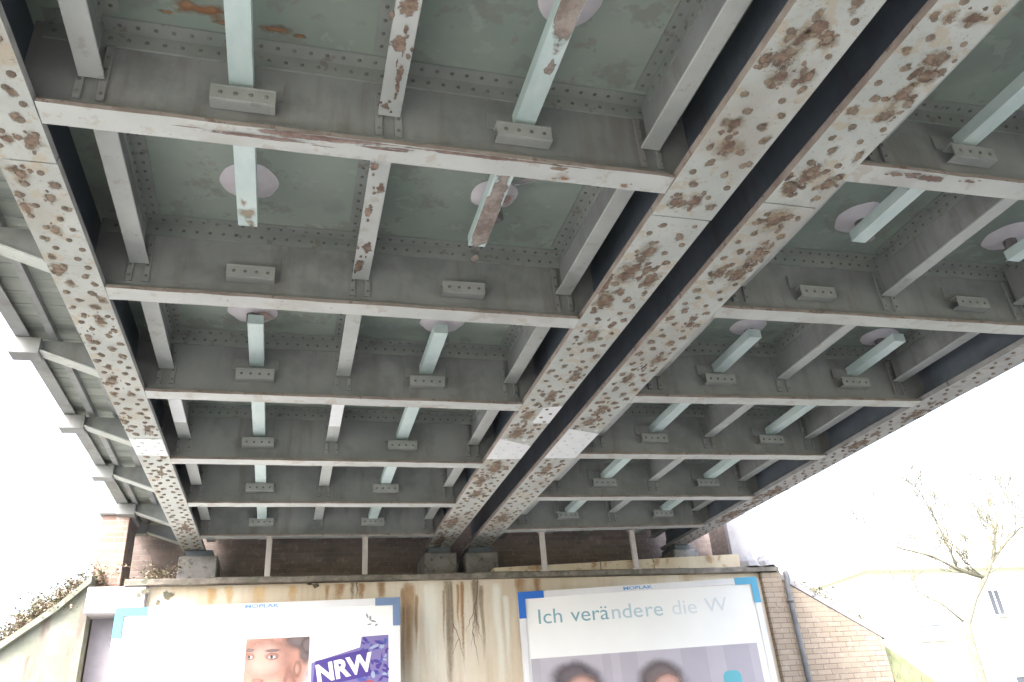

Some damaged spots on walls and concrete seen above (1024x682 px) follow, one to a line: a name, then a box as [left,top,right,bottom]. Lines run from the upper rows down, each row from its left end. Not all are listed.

rust [160,0,225,25]
rust [544,0,586,75]
rust [470,175,510,263]
rust [885,172,943,182]
rust [92,331,155,436]
rust [590,334,685,428]
damp [400,579,512,682]